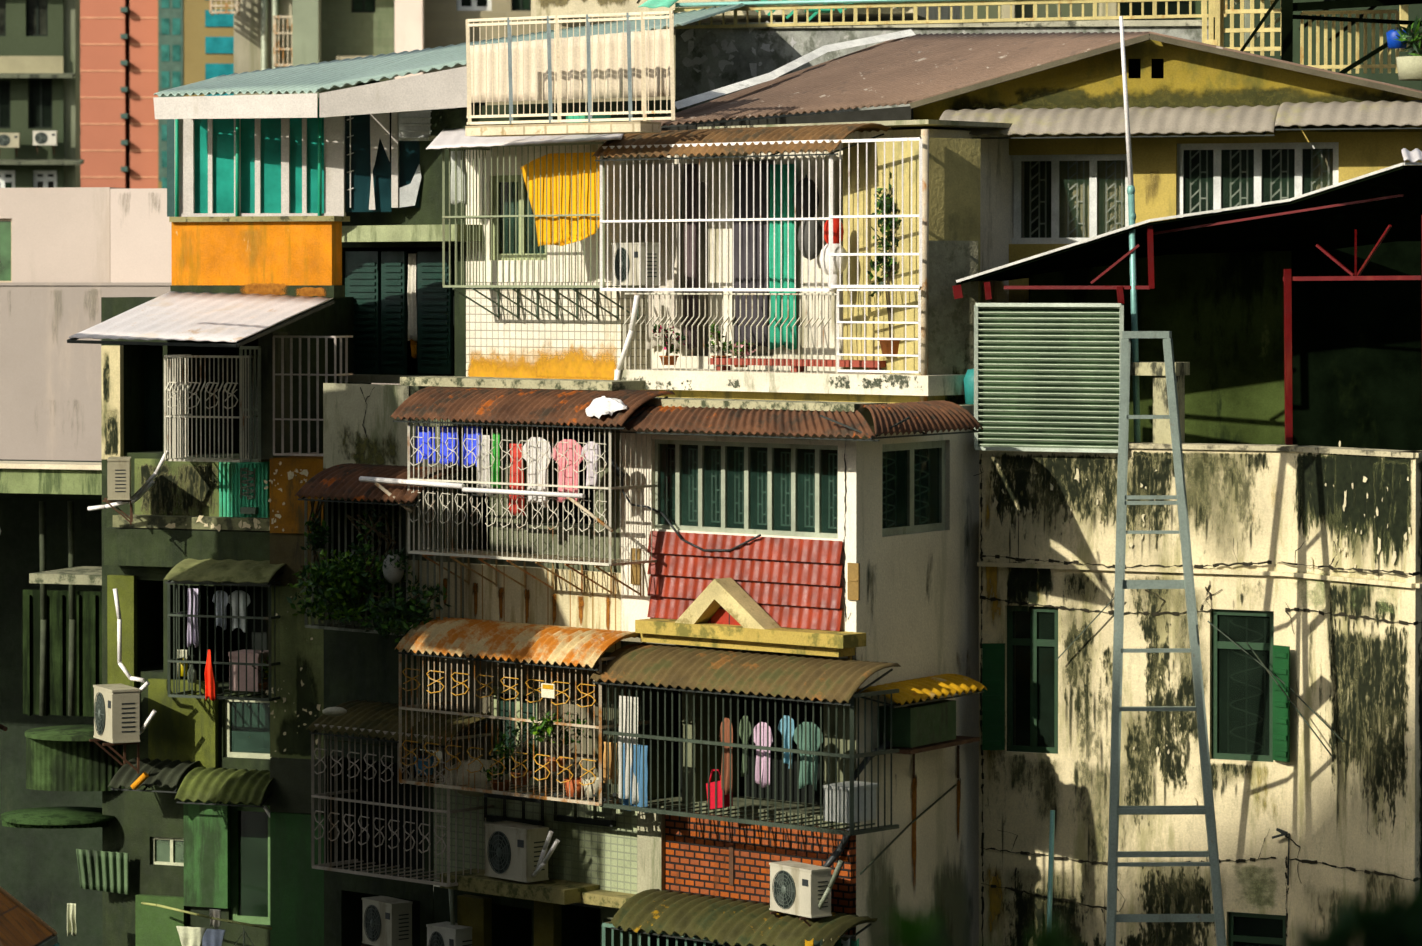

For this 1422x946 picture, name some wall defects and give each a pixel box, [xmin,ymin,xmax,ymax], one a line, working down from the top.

damp [990,451,1269,866]
damp [1294,452,1422,882]
damp [998,866,1216,946]